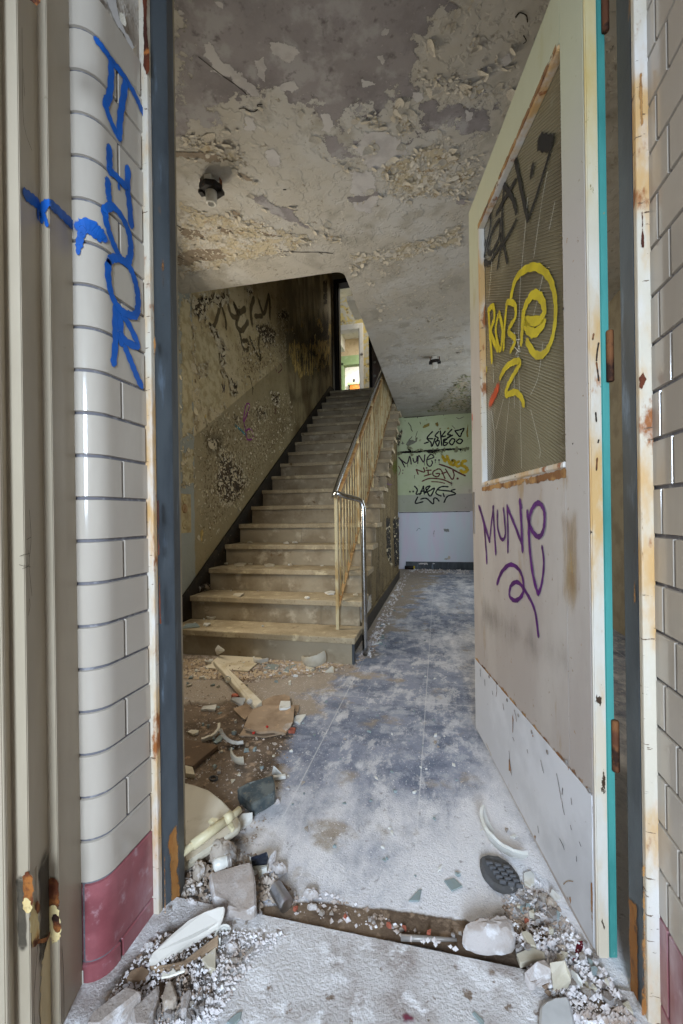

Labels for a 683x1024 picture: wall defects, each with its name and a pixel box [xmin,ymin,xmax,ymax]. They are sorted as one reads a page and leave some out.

peeling [174,0,517,280]
spalling [427,375,471,412]
corrosion [22,871,61,944]
corrosion [164,827,180,913]